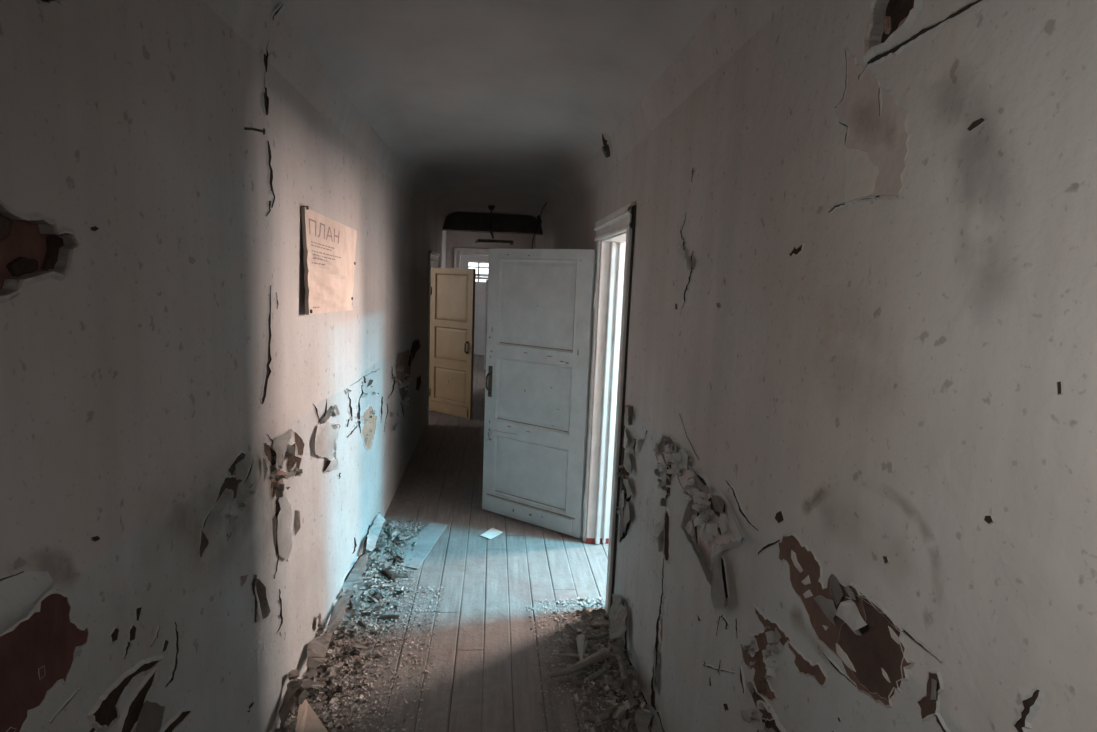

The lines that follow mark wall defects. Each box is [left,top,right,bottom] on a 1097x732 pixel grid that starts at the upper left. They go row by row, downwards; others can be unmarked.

flaking render [863,0,923,63]
spalling [967,117,987,132]
flaking render [0,199,80,303]
peeling [198,339,421,625]
peeling [616,403,745,636]
peeling [0,591,89,732]
peeling [87,606,194,732]
peeling [723,510,951,732]
crack [1013,688,1044,732]